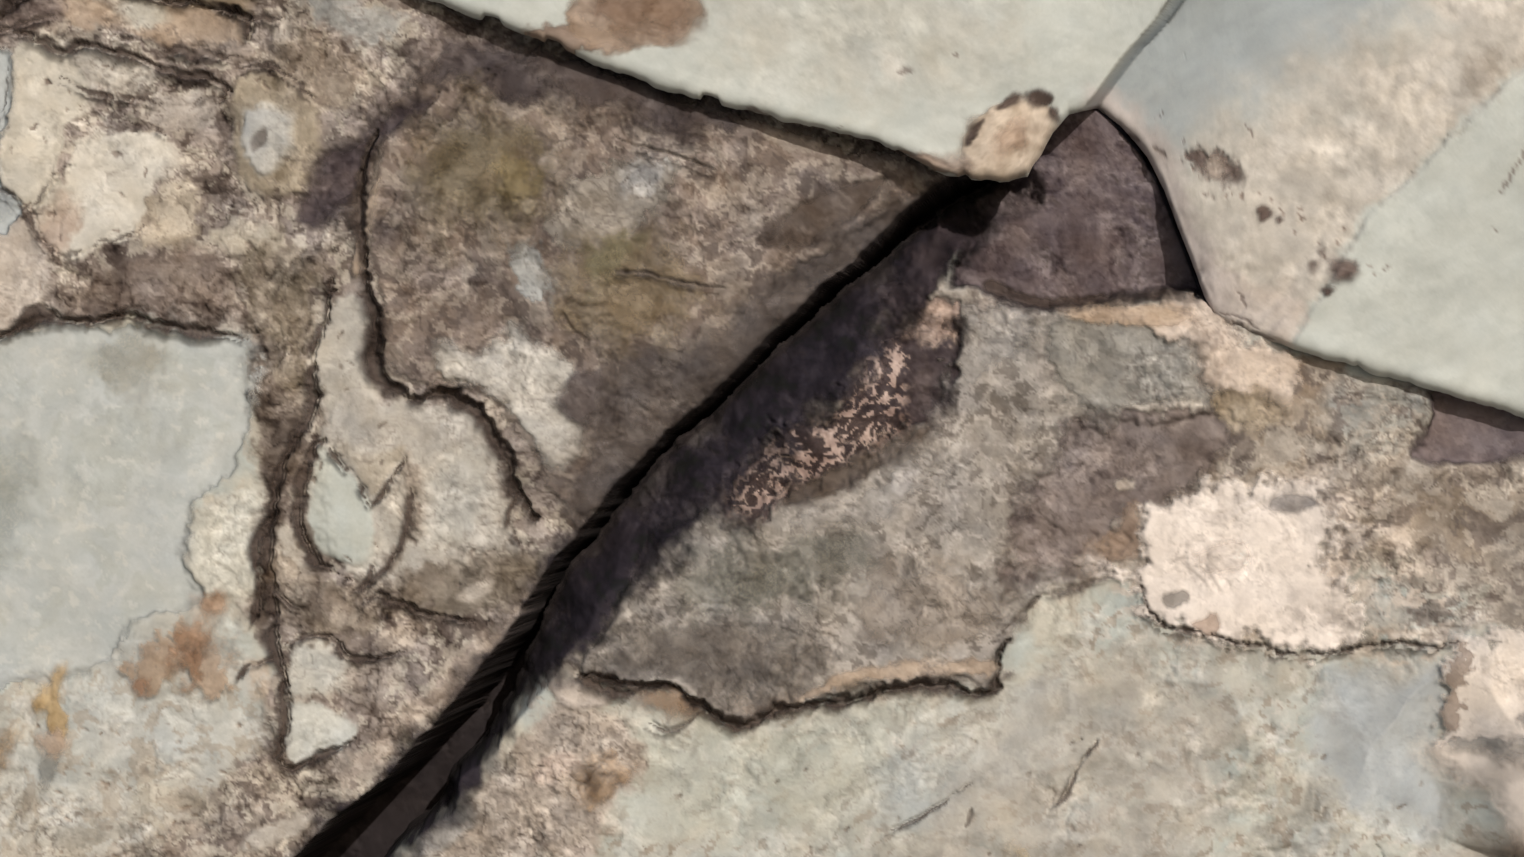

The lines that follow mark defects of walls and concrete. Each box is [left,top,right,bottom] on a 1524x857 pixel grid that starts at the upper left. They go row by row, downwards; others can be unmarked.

peeling [0,50,12,137]
peeling [0,180,21,235]
peeling [0,323,262,689]
crack [236,129,997,857]
spalling [299,42,966,507]
spalling [581,89,1365,721]
spalling [1410,390,1524,464]
peeling [1435,625,1524,766]